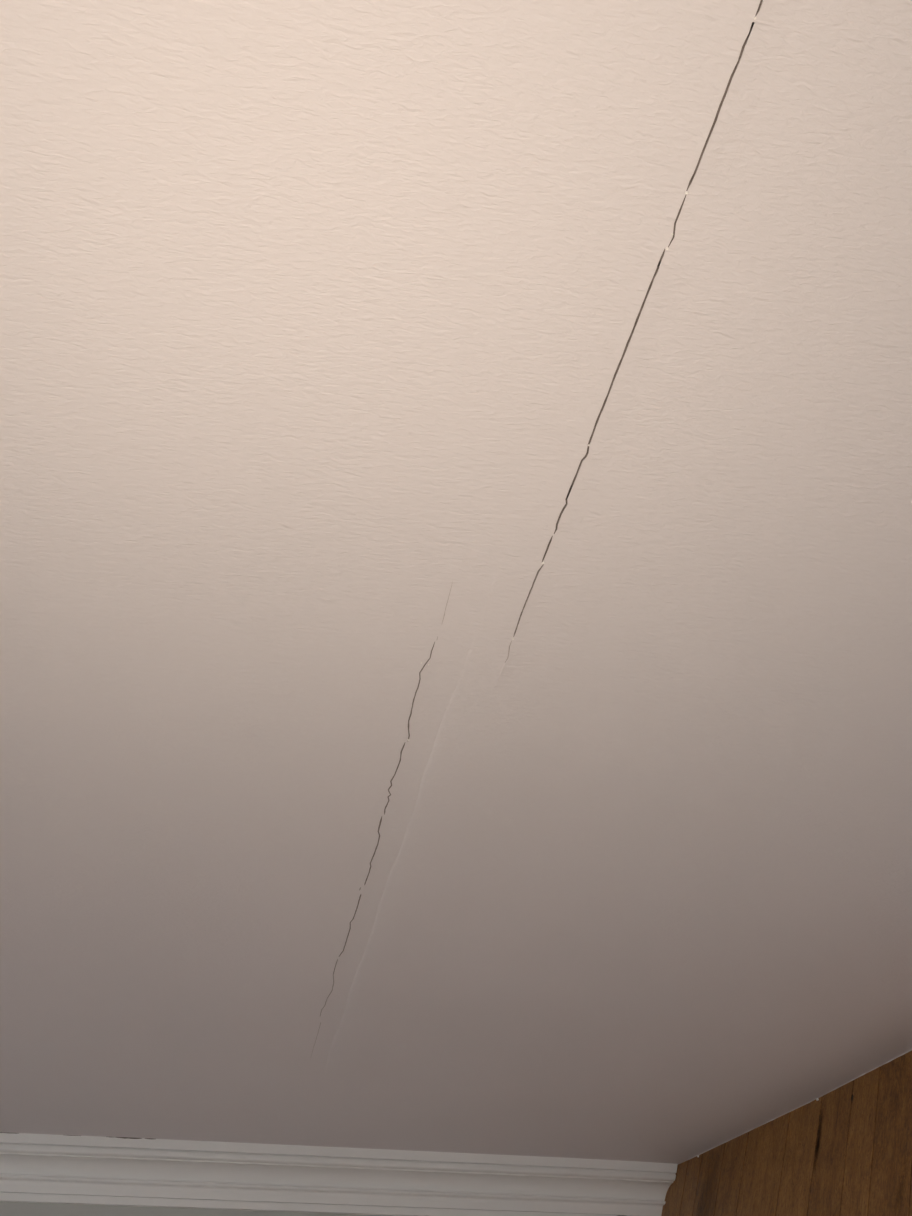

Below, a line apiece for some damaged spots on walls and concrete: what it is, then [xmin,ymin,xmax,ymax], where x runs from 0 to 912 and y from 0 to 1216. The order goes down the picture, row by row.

crack [491,0,800,695]
crack [311,586,452,1056]